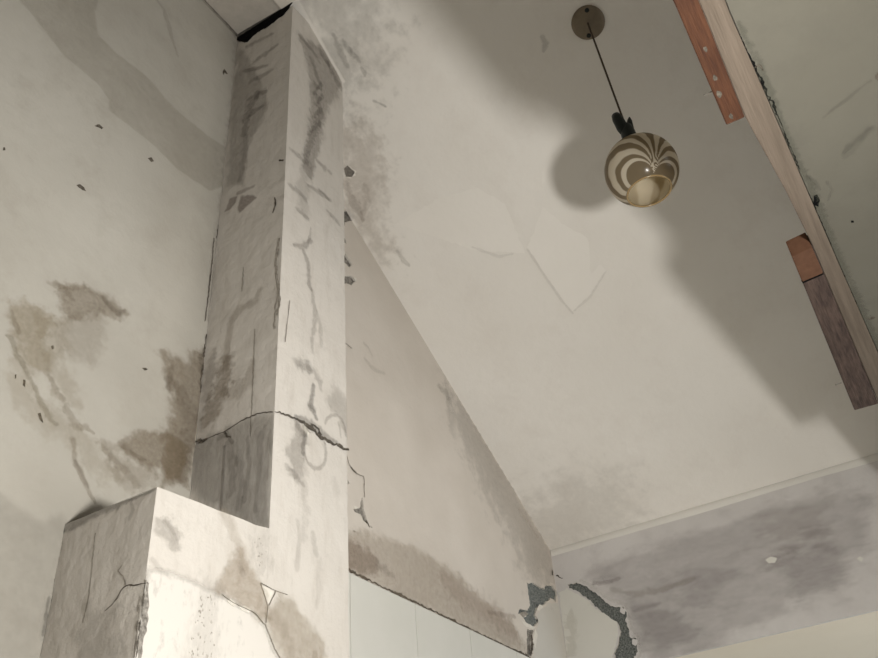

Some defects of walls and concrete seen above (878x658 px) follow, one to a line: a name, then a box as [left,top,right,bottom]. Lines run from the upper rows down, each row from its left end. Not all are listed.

crack [196,229,365,497]
crack [82,533,145,623]
crack [222,583,288,658]
spalling [518,583,555,656]
spalling [569,583,638,658]